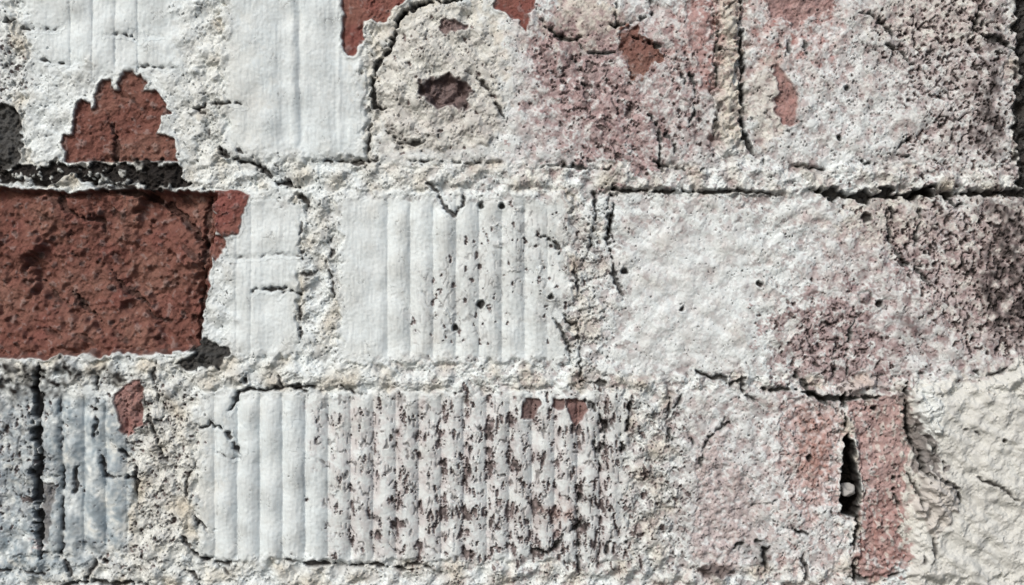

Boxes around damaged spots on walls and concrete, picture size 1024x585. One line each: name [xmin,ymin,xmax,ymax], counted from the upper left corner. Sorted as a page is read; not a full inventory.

peeling [58,67,181,166]
spalling [0,184,254,584]
crack [0,0,510,585]
peeling [286,0,1017,585]
crack [525,0,1024,585]